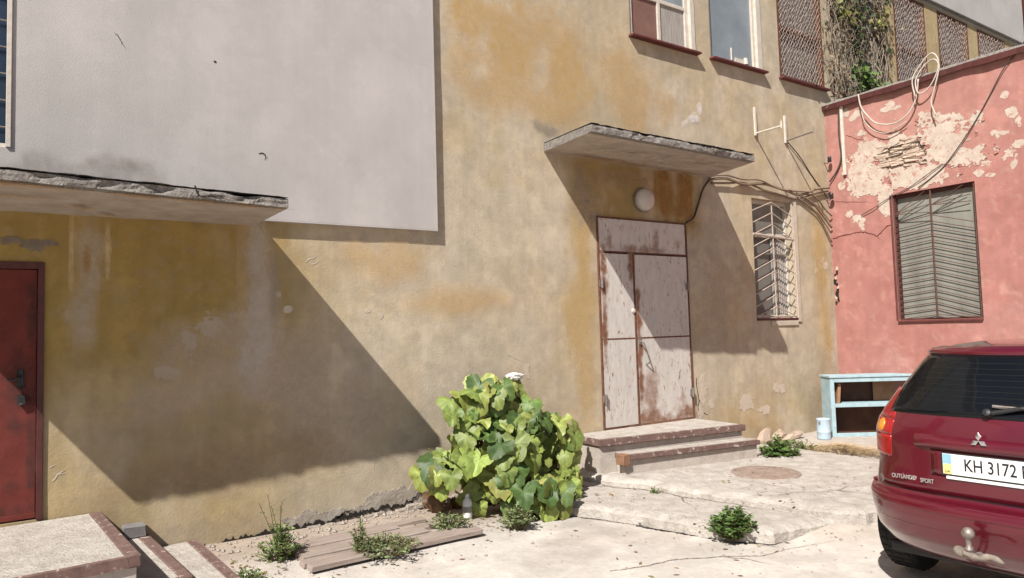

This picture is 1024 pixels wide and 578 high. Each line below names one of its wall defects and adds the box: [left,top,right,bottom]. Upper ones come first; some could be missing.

peeling [838,91,1024,218]
peeling [1,236,59,253]
peeling [845,210,866,230]
leakage [236,223,276,394]
corrosion [600,252,608,358]
corrosion [628,242,693,427]
peeling [739,394,771,415]
flaking render [278,482,429,529]